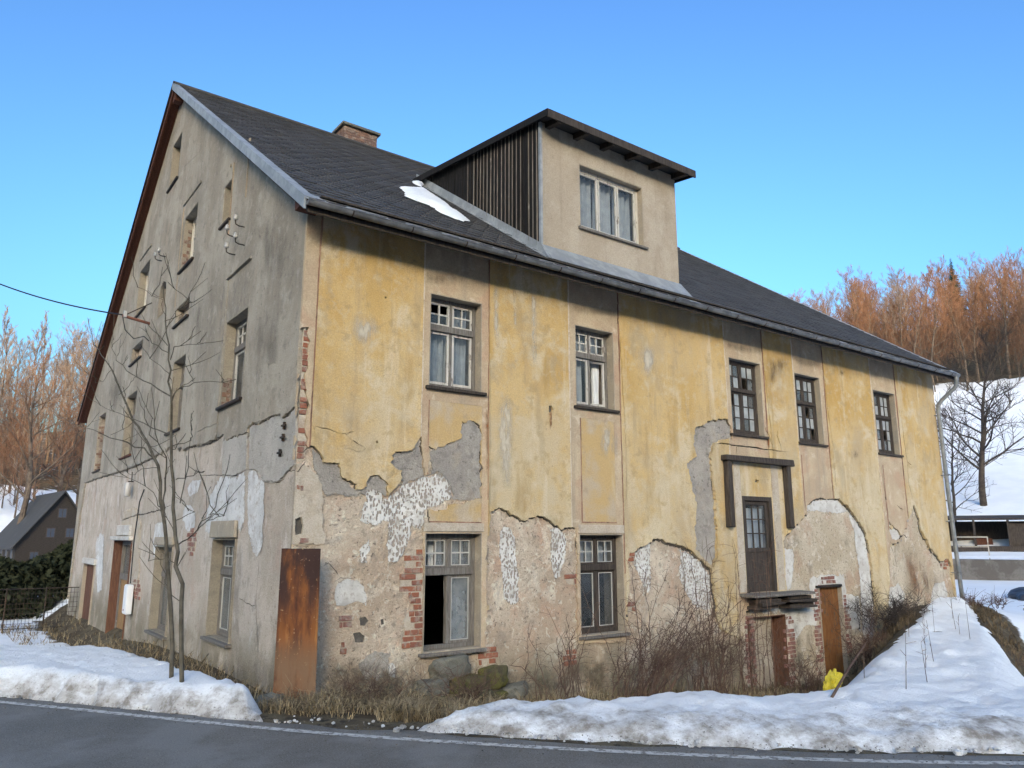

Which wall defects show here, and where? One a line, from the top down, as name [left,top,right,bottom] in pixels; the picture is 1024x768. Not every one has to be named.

flaking render [67,327,483,698]
corrosion [273,548,321,700]
flaking render [465,419,876,699]
flaking render [887,506,954,619]